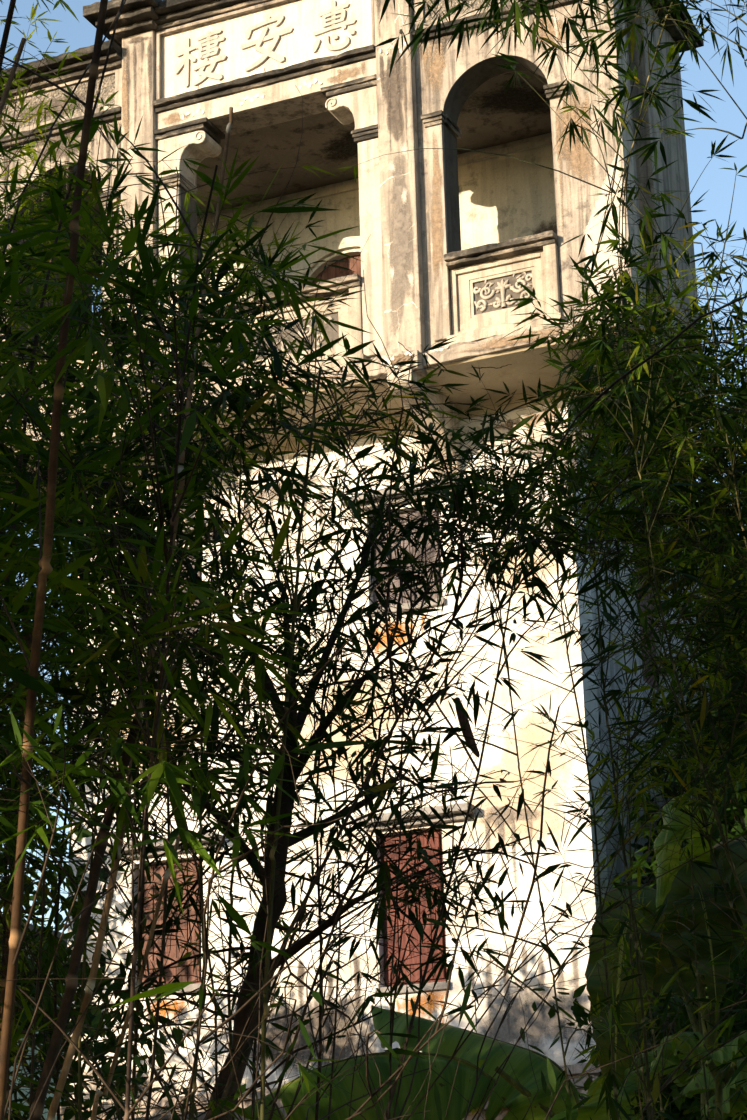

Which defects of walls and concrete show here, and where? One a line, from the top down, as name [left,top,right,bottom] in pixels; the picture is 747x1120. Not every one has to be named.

leakage [419,25,512,89]
leakage [526,15,566,44]
leakage [380,50,413,331]
leakage [431,141,443,270]
leakage [470,80,594,194]
leakage [533,212,563,236]
leakage [477,728,566,875]